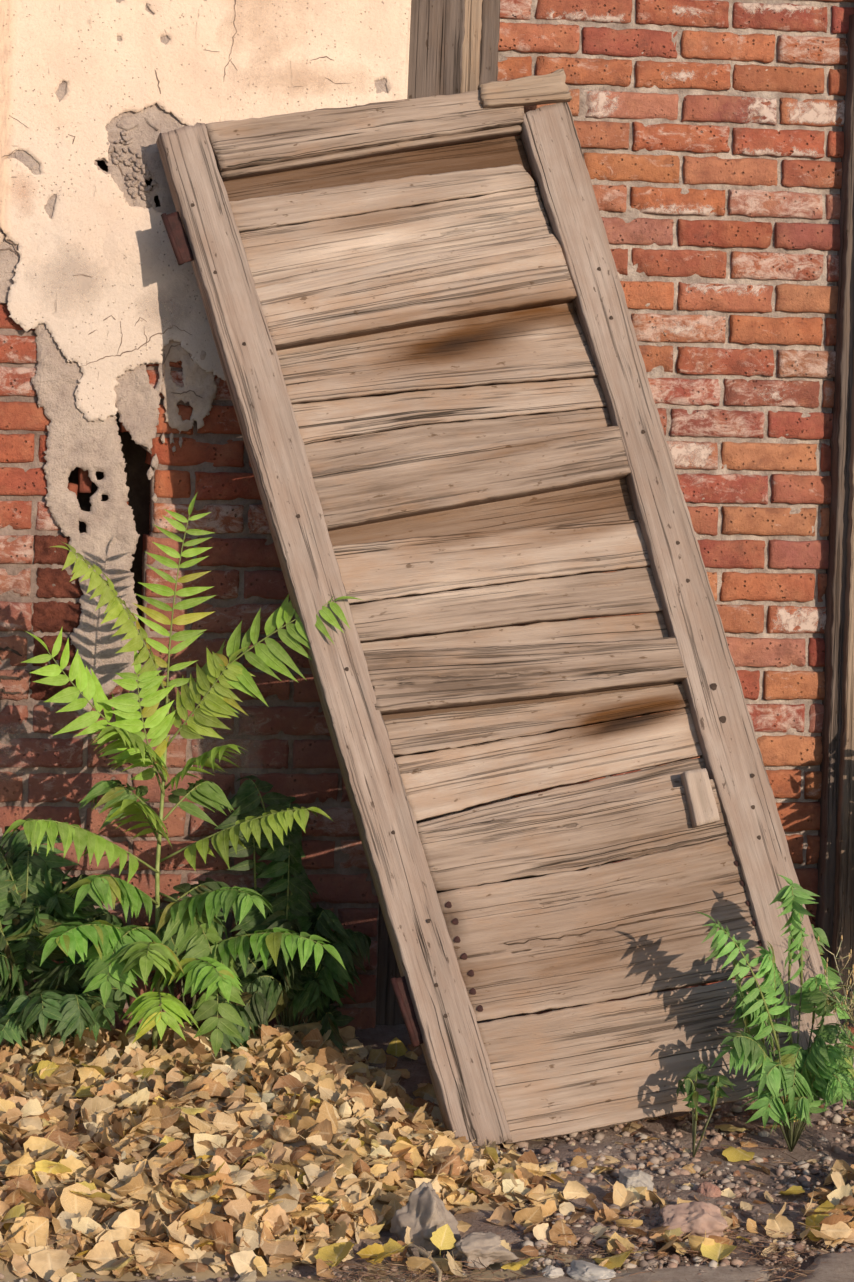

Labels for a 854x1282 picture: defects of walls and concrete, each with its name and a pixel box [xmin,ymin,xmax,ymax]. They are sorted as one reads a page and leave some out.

crack [207,0,238,76]
flaking render [94,103,187,214]
flaking render [0,229,20,303]
flaking render [29,323,217,715]